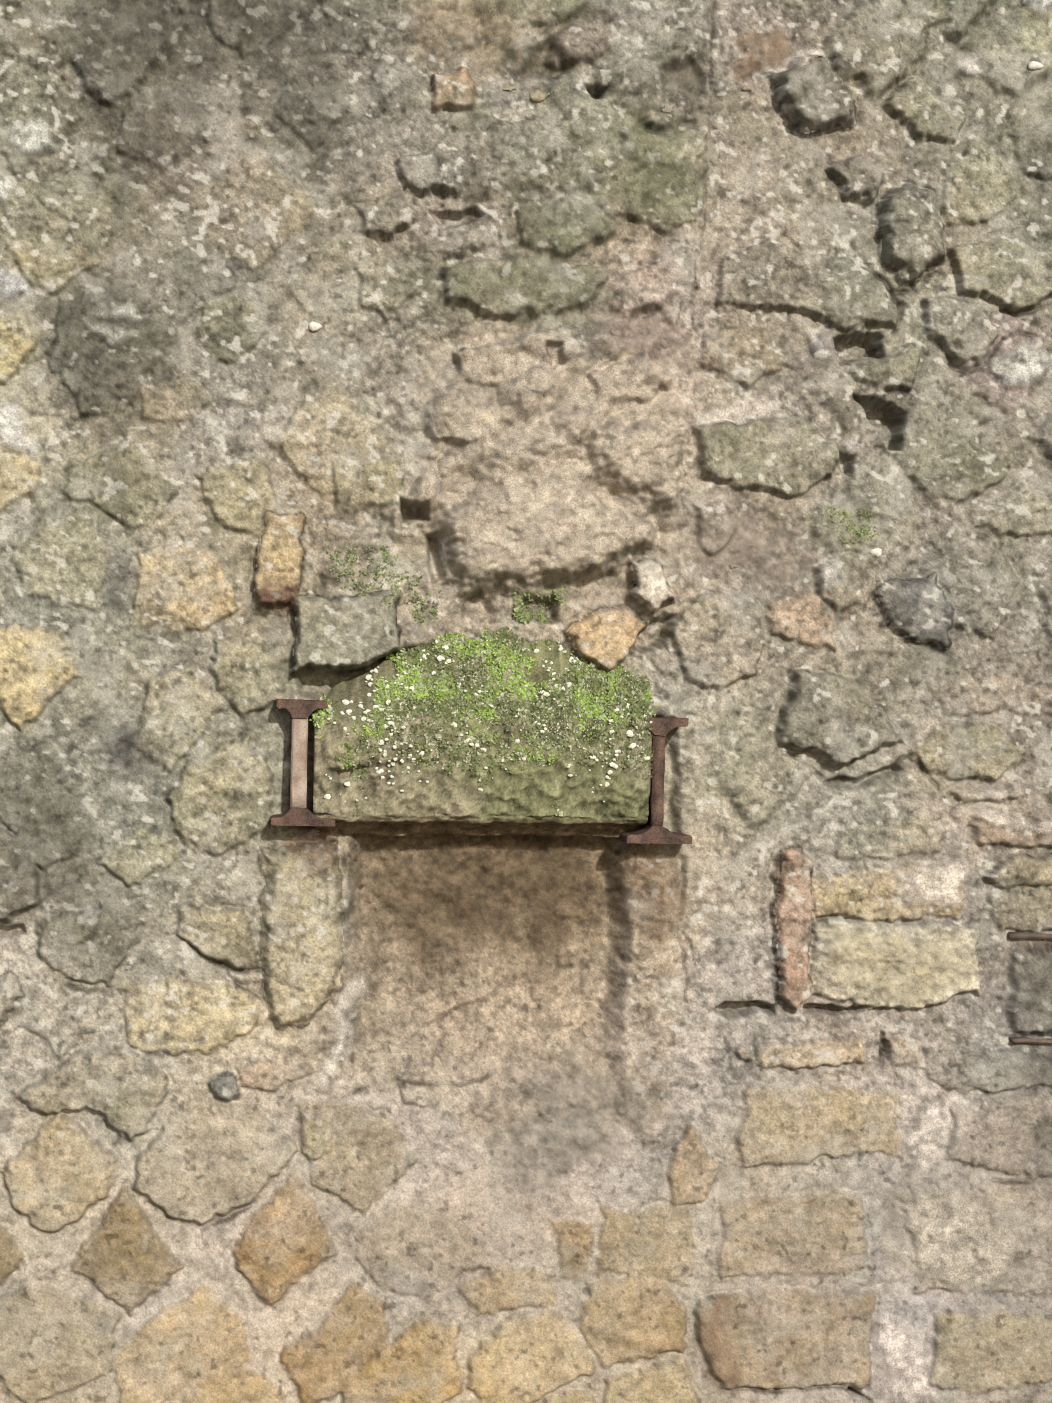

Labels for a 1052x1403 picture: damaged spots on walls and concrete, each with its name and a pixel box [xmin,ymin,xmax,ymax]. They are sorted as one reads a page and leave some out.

water stain [388,835,591,963]